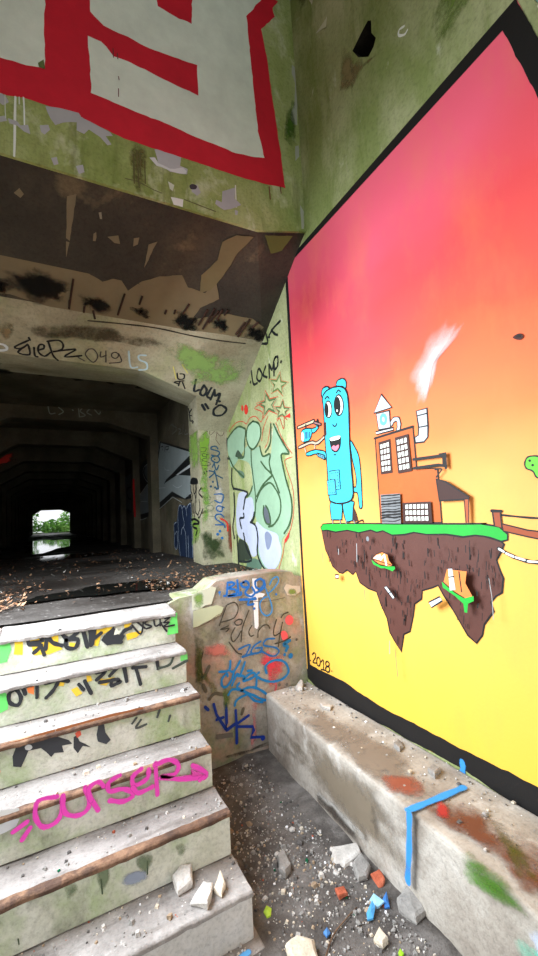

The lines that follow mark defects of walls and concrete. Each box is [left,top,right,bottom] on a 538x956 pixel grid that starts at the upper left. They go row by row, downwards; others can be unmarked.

peeling [149,149,201,207]
peeling [215,188,241,215]
damp [34,326,157,346]